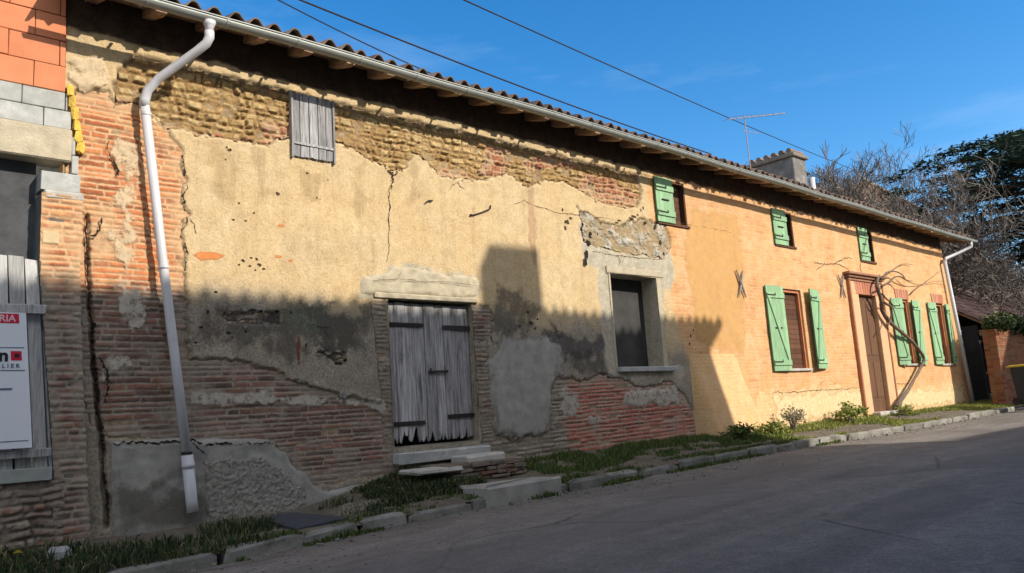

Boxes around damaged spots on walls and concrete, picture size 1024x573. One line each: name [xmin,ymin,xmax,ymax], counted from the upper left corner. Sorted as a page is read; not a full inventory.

flaking render [65,55,396,522]
crack [376,166,475,286]
flaking render [334,104,670,266]
crack [84,216,275,527]
flaking render [472,305,696,459]